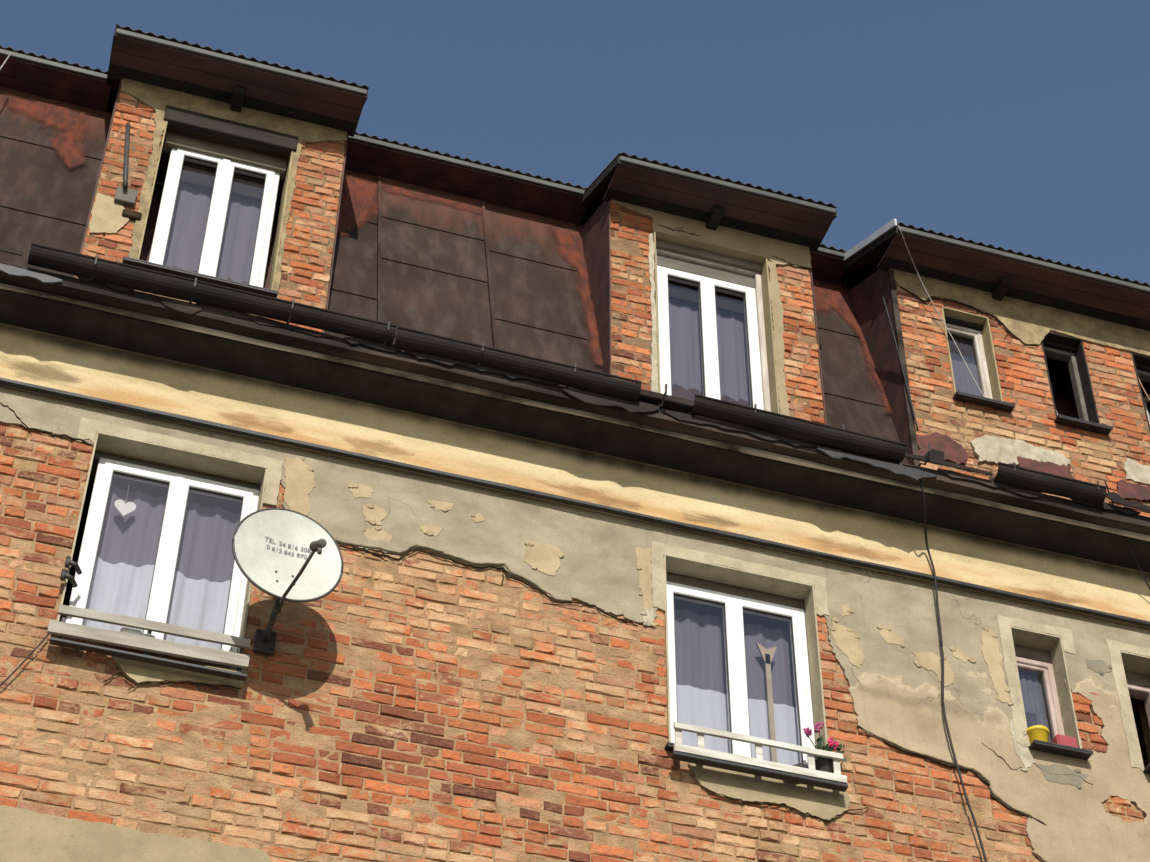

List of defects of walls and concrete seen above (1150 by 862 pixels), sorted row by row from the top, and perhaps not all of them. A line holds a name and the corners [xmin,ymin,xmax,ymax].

rust [5,96,85,168]
rust [337,175,482,235]
rust [813,278,892,412]
spalling [0,423,1041,862]
spalling [1065,680,1108,753]
peeling [1009,719,1087,789]
spalling [1102,796,1144,823]